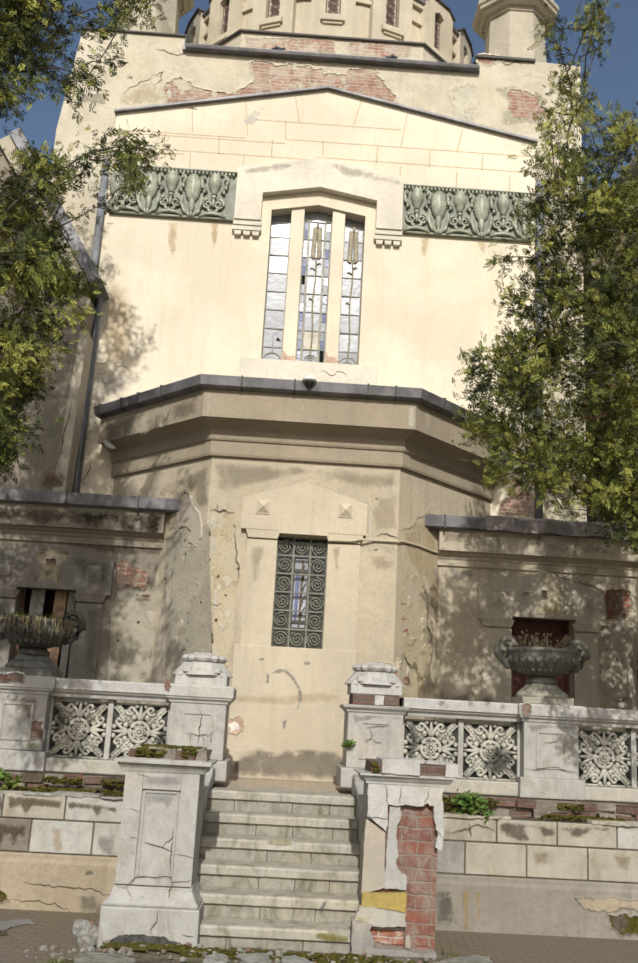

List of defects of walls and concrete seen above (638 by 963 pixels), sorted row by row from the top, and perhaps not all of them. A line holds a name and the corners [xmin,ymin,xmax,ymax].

spalling [160,36,408,112]
spalling [496,476,535,519]
crack [212,506,240,577]
flaking render [105,491,240,691]
flaking render [597,586,638,710]
damp [234,751,342,776]
damp [0,825,24,844]
damp [0,797,116,814]
crack [19,835,194,934]
flaking render [574,894,638,939]